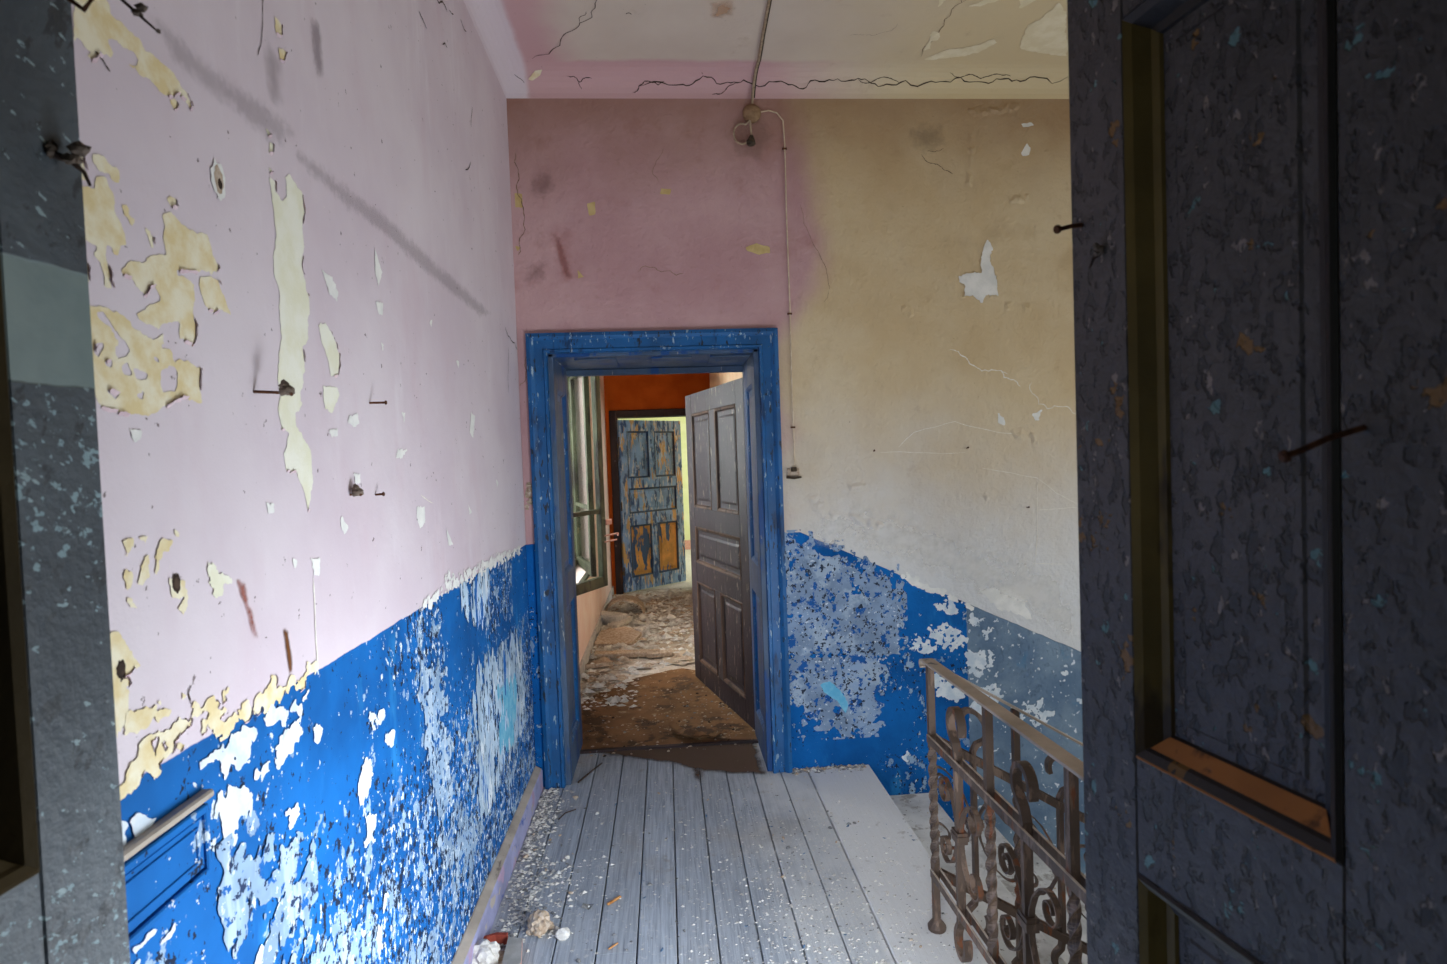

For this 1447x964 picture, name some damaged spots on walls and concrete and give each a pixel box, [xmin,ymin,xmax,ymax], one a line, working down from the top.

peeling [73,0,194,111]
crack [515,0,597,89]
crack [634,1,1067,95]
peeling [1019,0,1068,56]
peeling [81,154,231,442]
peeling [266,129,359,512]
flaking render [959,240,998,303]
peeling [422,545,522,632]
peeling [785,530,1032,740]
peeling [110,631,388,964]
peeling [369,708,395,748]
peeling [417,630,526,890]